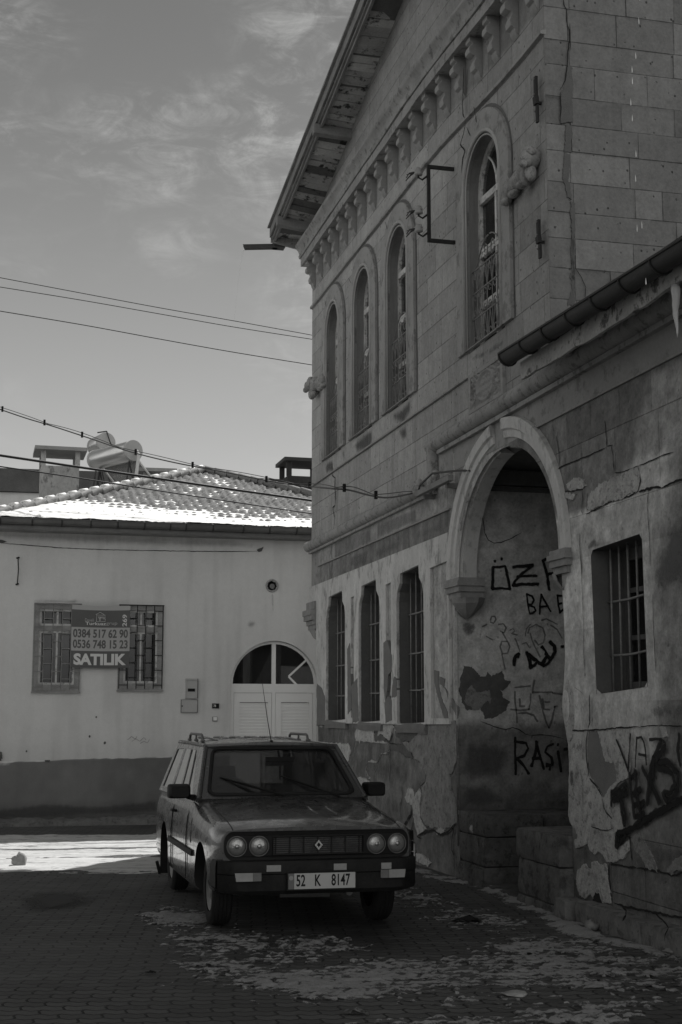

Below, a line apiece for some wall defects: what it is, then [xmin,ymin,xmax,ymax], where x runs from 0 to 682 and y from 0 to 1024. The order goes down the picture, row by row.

crack [560,0,571,118]
flaking render [564,467,641,511]
crack [556,426,682,605]
spalling [317,684,325,728]
flaking render [331,640,511,867]
flaking render [568,729,682,904]